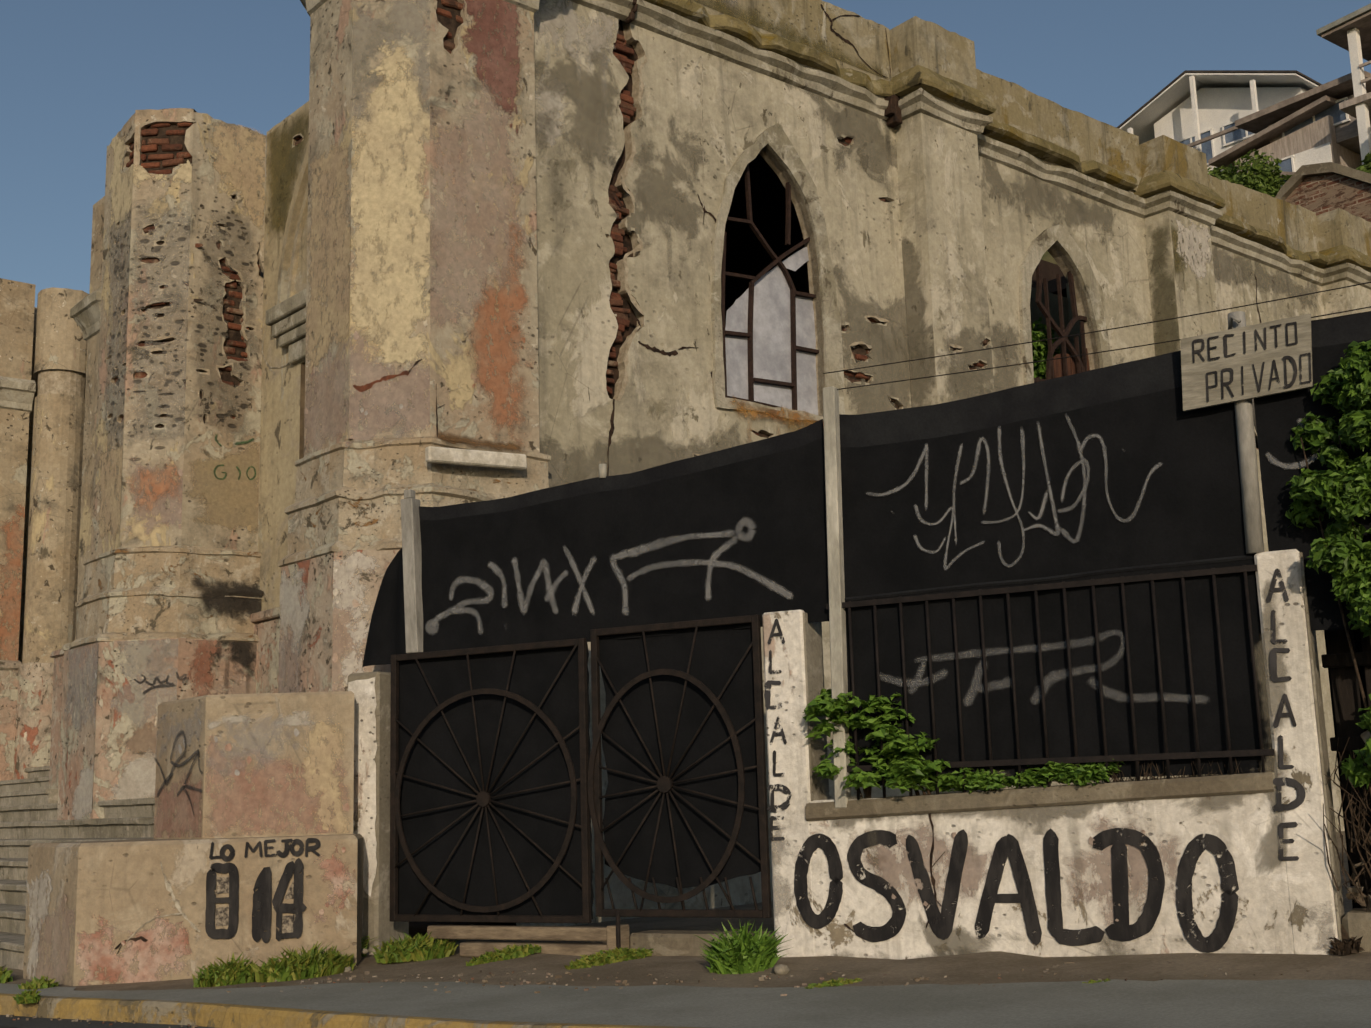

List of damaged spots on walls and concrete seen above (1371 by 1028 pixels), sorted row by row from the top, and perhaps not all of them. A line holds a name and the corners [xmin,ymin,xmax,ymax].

peeling [434,0,523,133]
leakage [534,0,619,166]
crack [606,0,698,476]
leakage [614,121,705,238]
leakage [787,83,898,180]
crack [821,4,891,78]
leakage [983,158,1113,243]
peeling [99,120,266,540]
flaking render [841,326,872,383]
leakage [834,239,1020,415]
leakage [192,569,310,653]